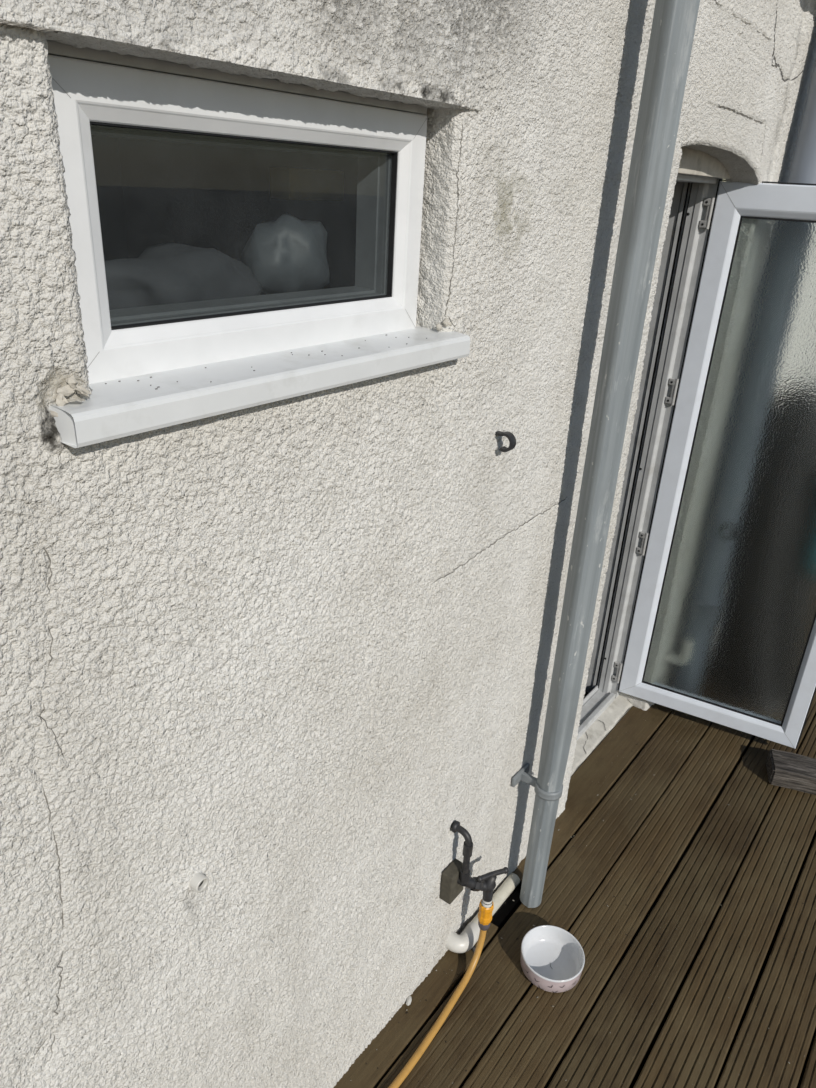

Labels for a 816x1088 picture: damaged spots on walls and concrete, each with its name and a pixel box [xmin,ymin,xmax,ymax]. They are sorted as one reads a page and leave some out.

crack [772,0,803,82]
spalling [42,372,91,451]